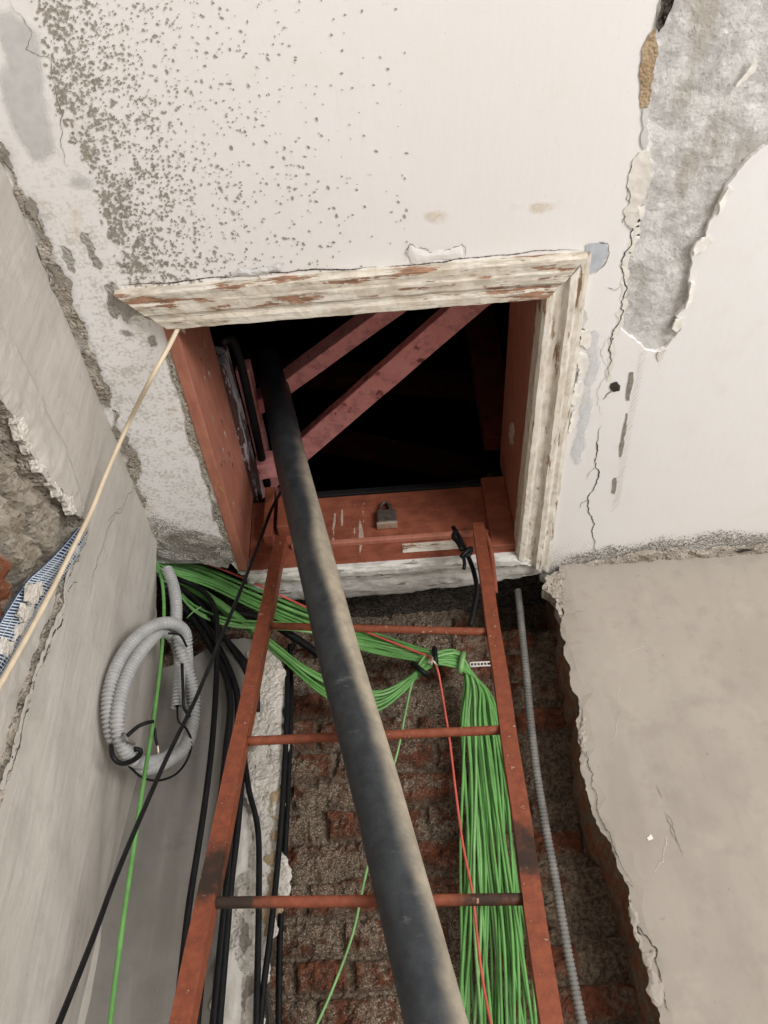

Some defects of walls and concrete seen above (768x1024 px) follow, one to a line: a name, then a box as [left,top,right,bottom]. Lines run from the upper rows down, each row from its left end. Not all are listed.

peeling [10,0,610,324]
flaking render [620,0,768,362]
peeling [568,310,634,464]
crack [580,166,645,546]
flaking render [0,415,84,620]
flaking render [541,570,565,624]
flaking render [578,708,588,757]
flaking render [628,896,664,1007]